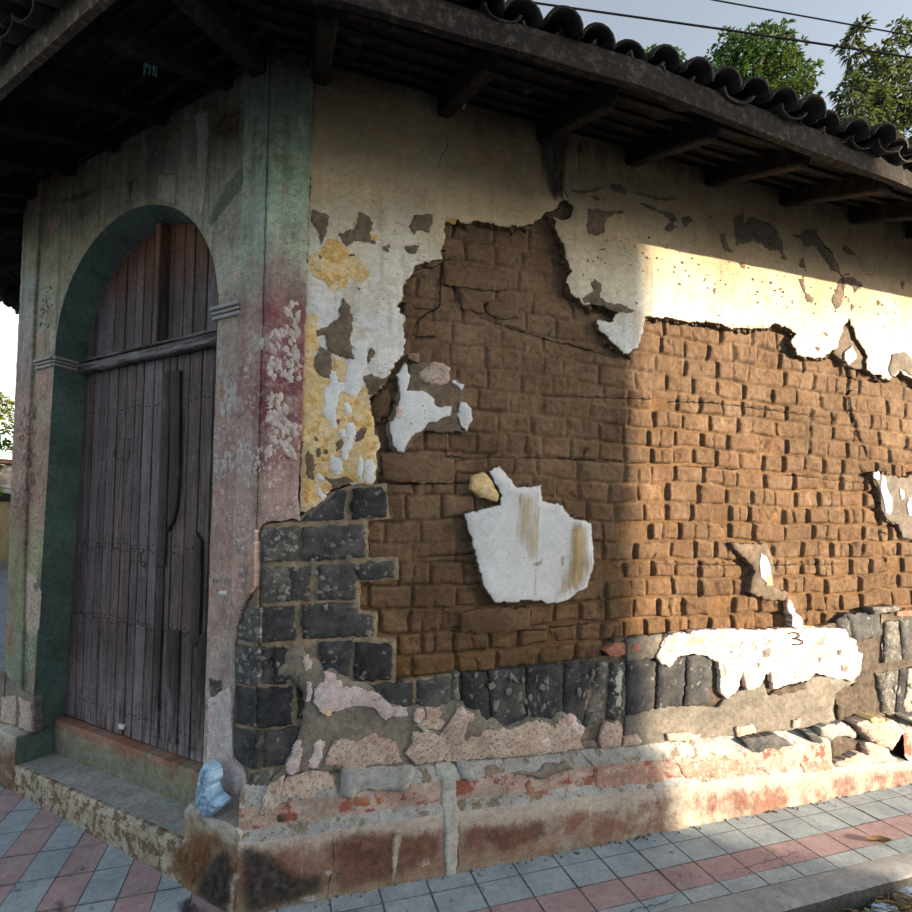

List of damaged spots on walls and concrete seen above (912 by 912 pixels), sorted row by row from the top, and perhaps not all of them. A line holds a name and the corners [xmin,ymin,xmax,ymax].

peeling [572,184,727,295]
crack [412,258,453,338]
crack [481,318,602,354]
flaking render [215,204,912,699]
crack [548,390,819,417]
crack [846,376,865,452]
crack [380,439,912,588]
peeling [260,671,585,823]
peeling [598,720,642,749]
peeling [677,759,755,779]
peeling [735,724,756,737]
damp [181,849,332,912]